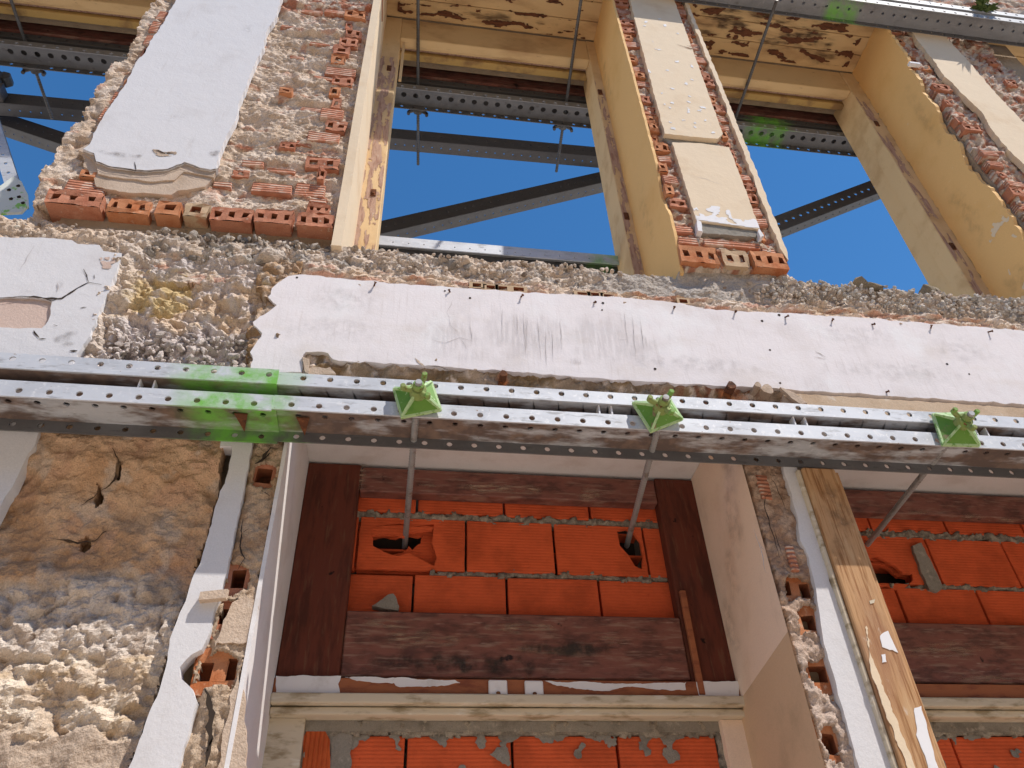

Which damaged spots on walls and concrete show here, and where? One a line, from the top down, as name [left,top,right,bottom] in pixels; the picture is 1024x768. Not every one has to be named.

peeling [398,0,585,39]
peeling [692,4,861,67]
spalling [0,298,51,328]
crack [0,270,101,339]
spalling [243,260,303,375]
crack [82,448,120,505]
crack [56,531,106,544]
spalling [190,564,250,696]
spalling [785,577,818,635]
spalling [806,658,834,701]
peeling [865,626,981,768]
spalling [812,719,842,764]